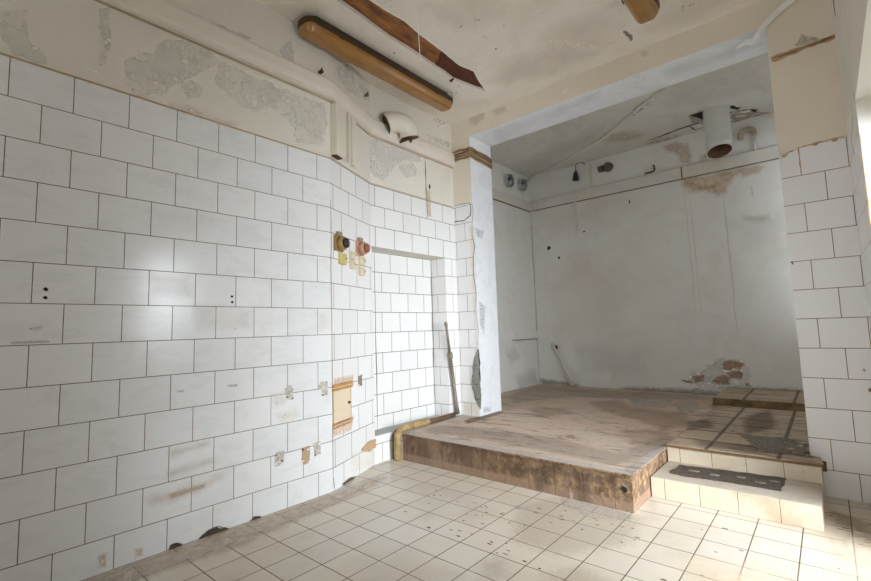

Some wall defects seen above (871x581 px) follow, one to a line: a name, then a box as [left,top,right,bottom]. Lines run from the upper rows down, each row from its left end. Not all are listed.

flaking render [681,359,750,389]
spalling [285,385,294,400]
spalling [274,450,284,467]
spalling [302,441,321,465]
spalling [361,439,376,452]